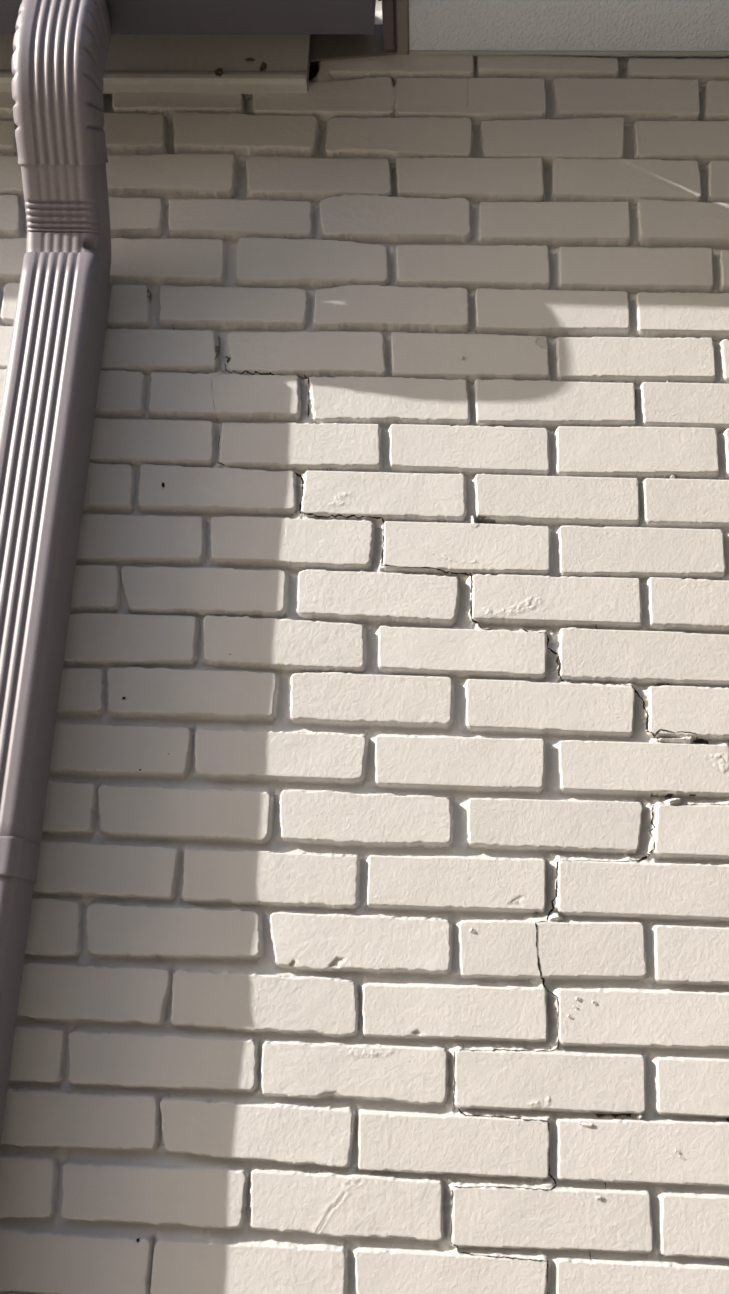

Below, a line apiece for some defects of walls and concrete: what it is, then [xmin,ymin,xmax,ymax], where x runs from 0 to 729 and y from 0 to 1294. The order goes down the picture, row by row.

crack [211,364,310,466]
crack [295,472,698,740]
crack [451,804,729,1294]